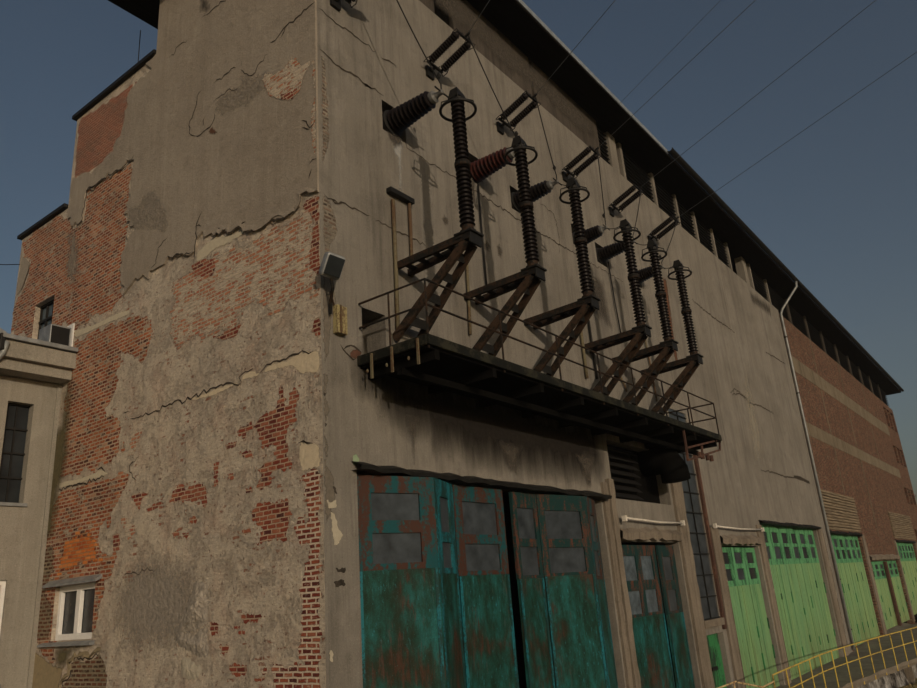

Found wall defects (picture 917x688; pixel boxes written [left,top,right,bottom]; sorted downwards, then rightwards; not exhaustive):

spalling [75,81,137,178]
crack [189,3,395,137]
spalling [262,57,330,160]
crack [151,214,201,268]
spalling [169,187,337,357]
spalling [11,155,234,688]
crack [124,350,311,419]
spalling [225,384,299,493]
crack [730,388,771,413]
crack [761,469,808,483]
spalling [229,439,343,688]